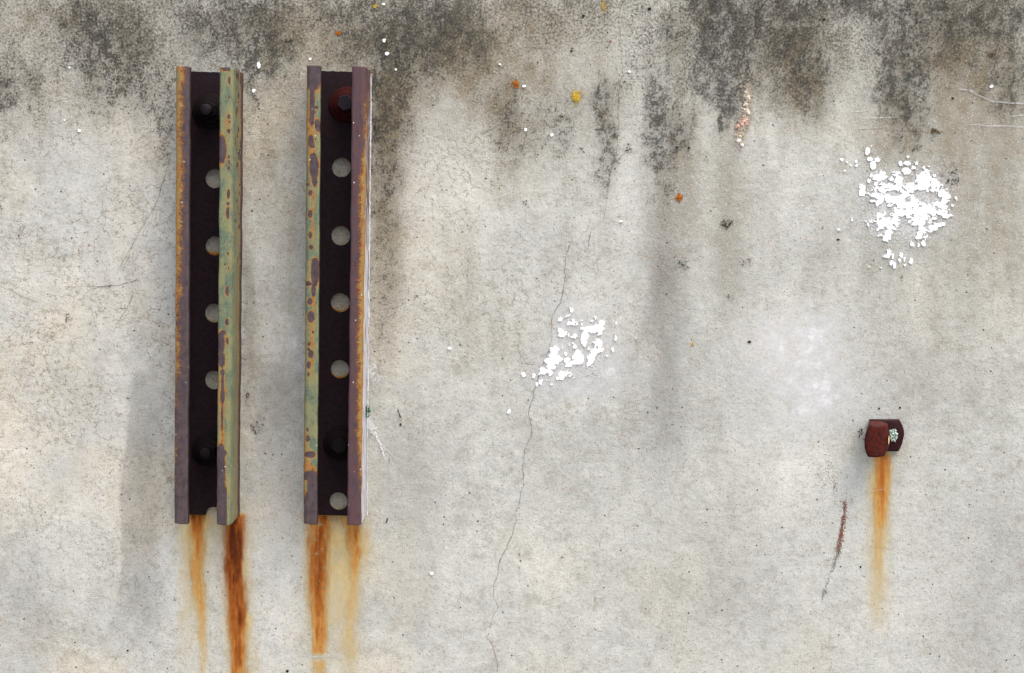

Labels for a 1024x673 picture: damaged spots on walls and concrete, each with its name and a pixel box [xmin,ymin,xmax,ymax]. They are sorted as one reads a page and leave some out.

leakage [0,56,48,112]
leakage [58,0,176,158]
leakage [173,0,489,338]
leakage [491,78,577,162]
leakage [590,78,627,198]
leakage [636,0,1024,209]
peeling [840,145,957,269]
peeling [521,308,617,386]
corrosion [181,512,211,668]
corrosion [224,512,252,673]
corrosion [307,507,368,673]
corrosion [868,452,891,573]